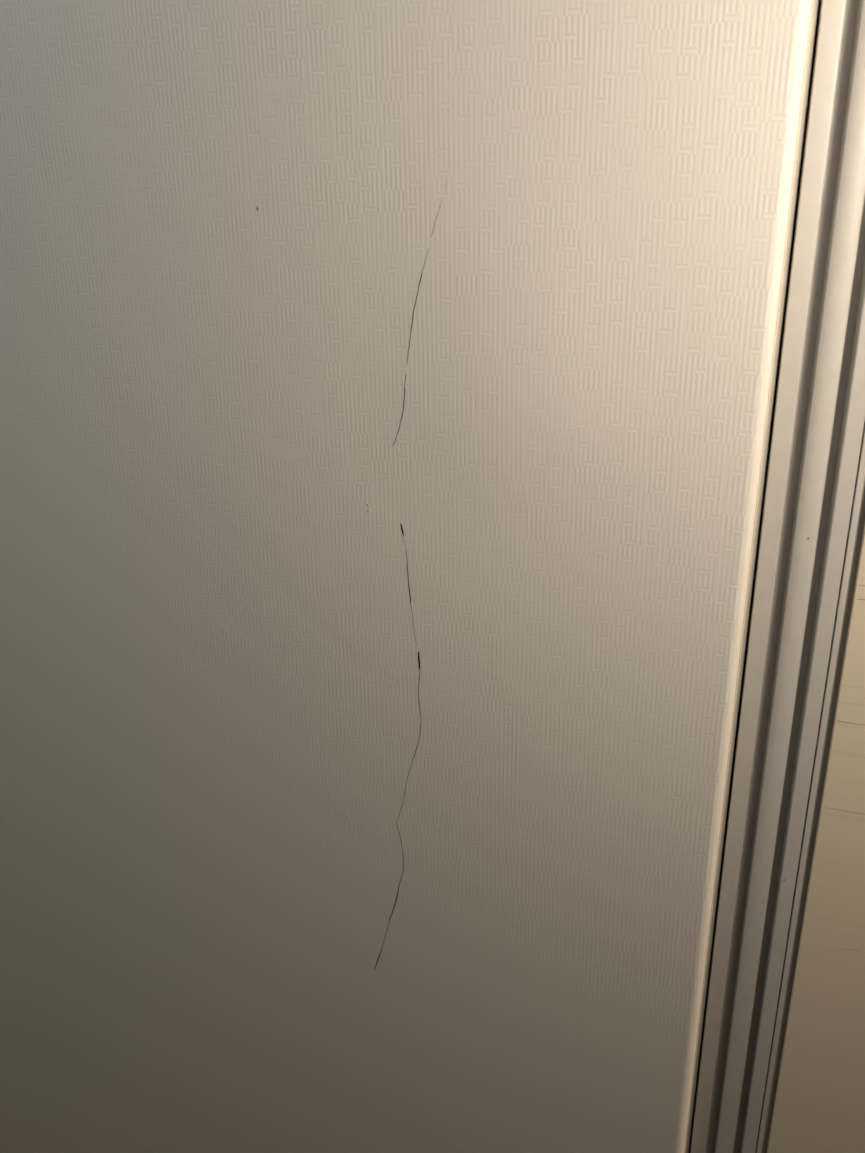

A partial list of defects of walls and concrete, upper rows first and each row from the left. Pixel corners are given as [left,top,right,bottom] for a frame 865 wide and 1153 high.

crack [393,178,447,446]
crack [374,523,422,970]